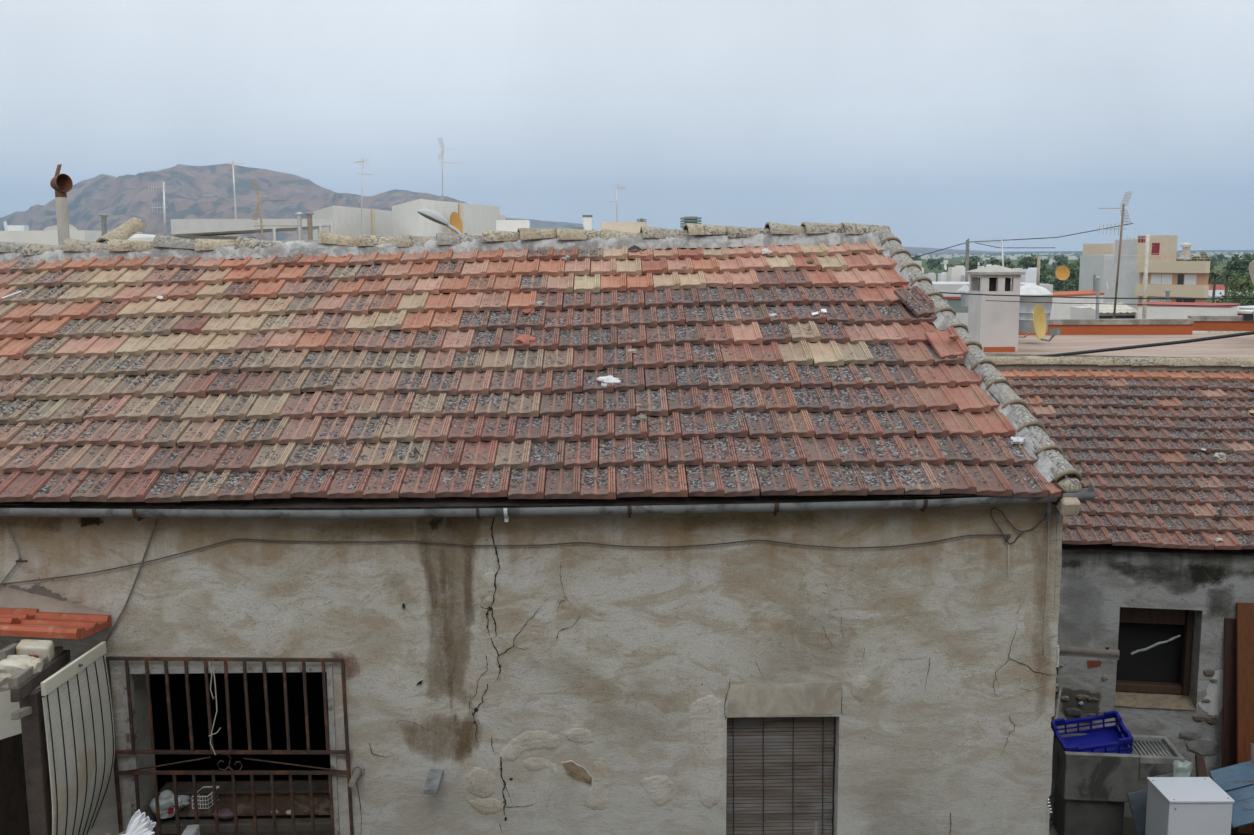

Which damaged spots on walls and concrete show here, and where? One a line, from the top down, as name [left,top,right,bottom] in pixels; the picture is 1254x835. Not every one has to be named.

water stain [1191,566,1231,582]
flaking render [1087,647,1109,669]
crack [469,517,581,831]
crack [993,601,1051,746]
flaking render [561,760,594,786]